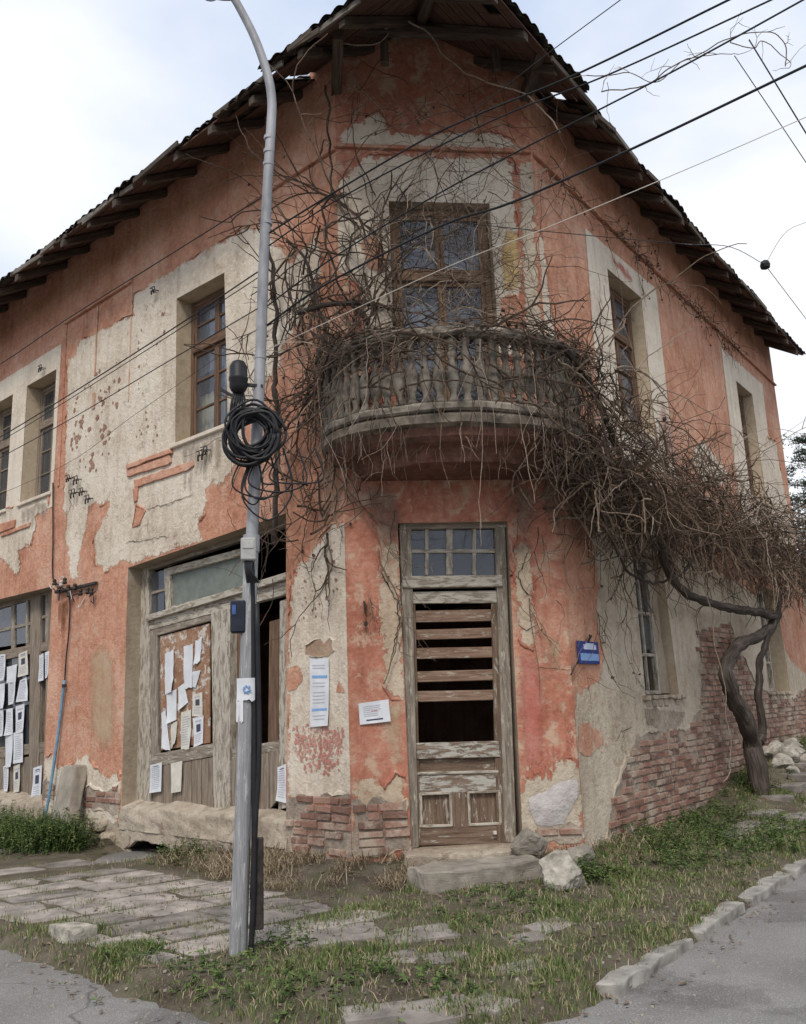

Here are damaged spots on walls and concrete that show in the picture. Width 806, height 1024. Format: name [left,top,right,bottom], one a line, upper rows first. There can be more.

flaking render [337,109,556,336]
flaking render [0,495,50,575]
flaking render [62,224,326,579]
flaking render [266,522,511,862]
flaking render [521,507,806,846]